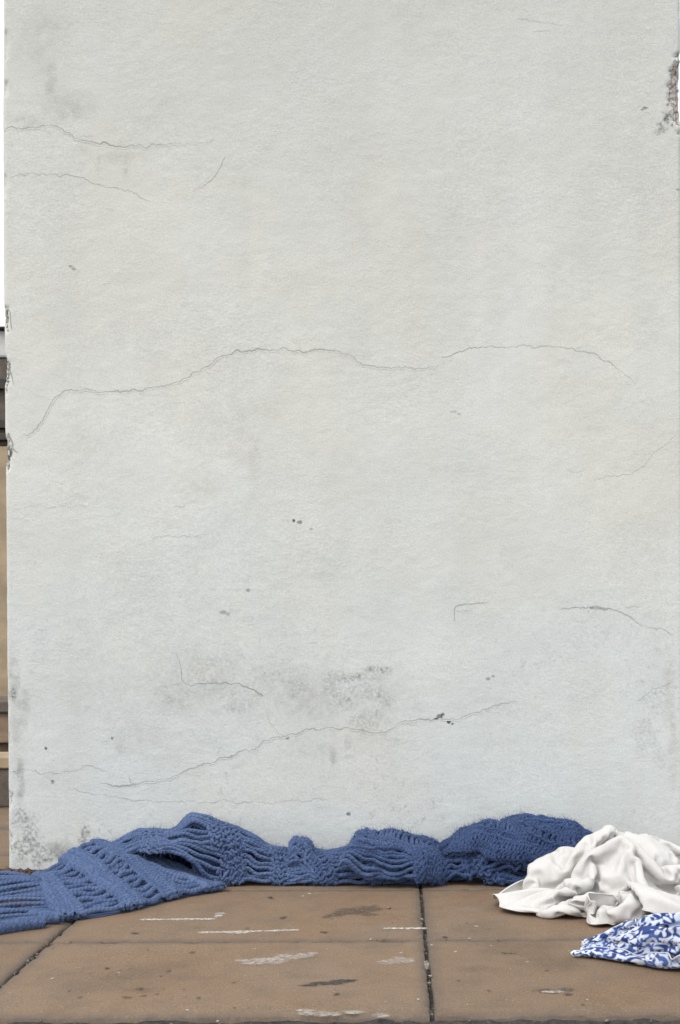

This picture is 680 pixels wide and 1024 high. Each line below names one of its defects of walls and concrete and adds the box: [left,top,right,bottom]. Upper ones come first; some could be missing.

spalling [666,53,680,134]
crack [8,348,453,445]
crack [86,697,536,789]